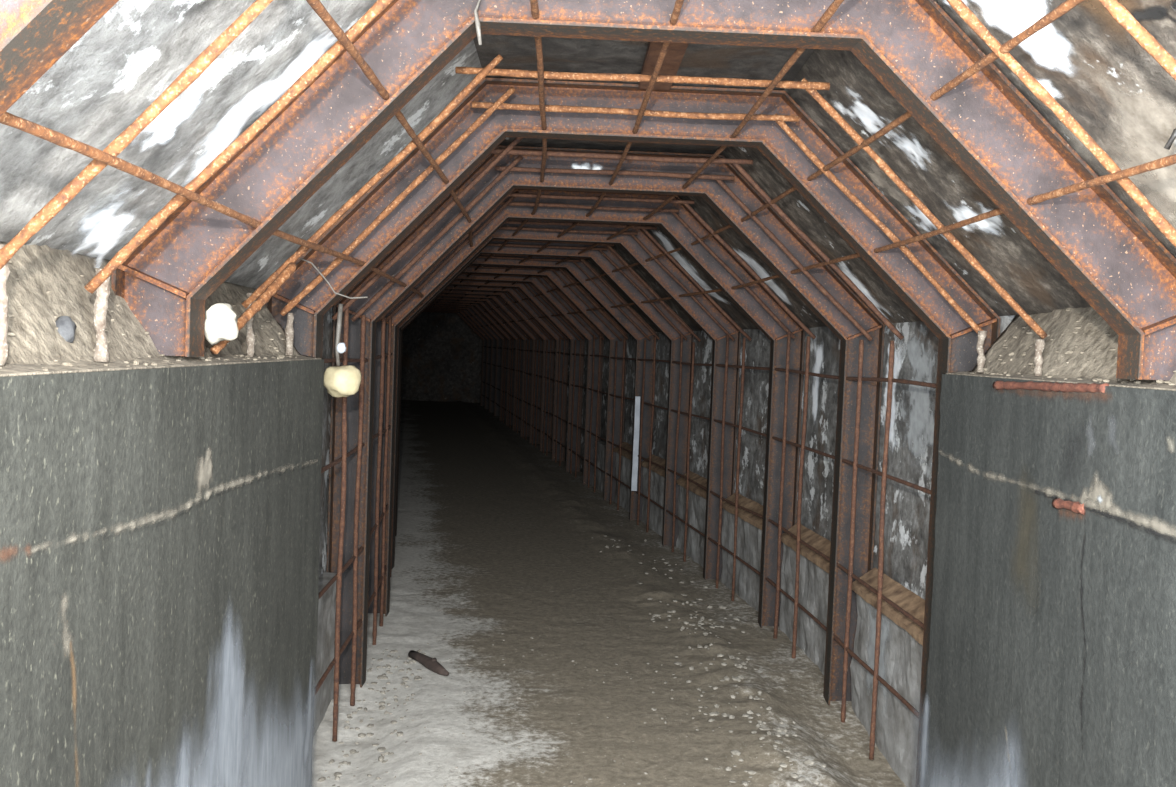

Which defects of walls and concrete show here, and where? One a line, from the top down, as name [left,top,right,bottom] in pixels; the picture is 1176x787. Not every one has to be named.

water stain [1081,0,1122,32]
water stain [1117,0,1134,11]
water stain [1113,90,1176,219]
crack [34,460,318,551]
crack [939,451,1176,716]
efflorescence [178,627,314,787]
efflorescence [920,699,961,787]
efflorescence [988,728,1018,787]